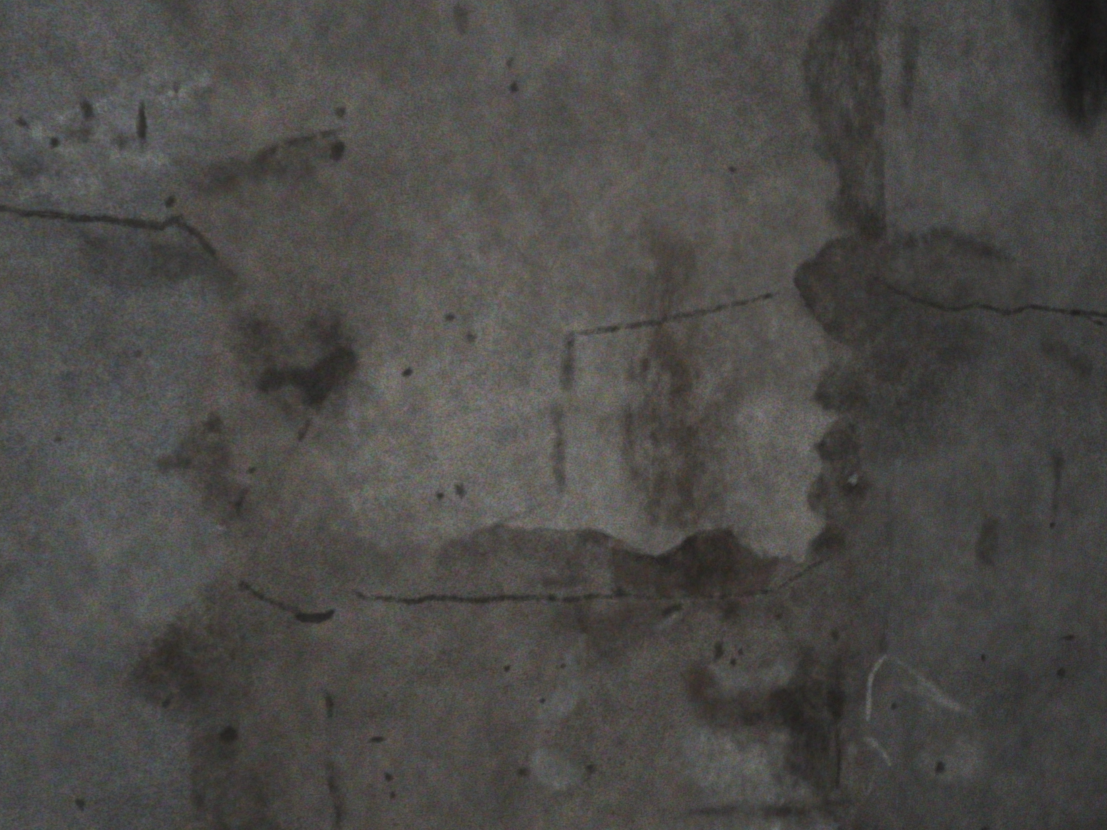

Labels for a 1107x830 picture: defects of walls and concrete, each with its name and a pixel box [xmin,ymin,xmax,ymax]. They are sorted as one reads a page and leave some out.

leakage [1054,0,1107,93]
crack [0,197,214,254]
crack [941,305,1105,324]
crack [242,583,334,622]
crack [360,595,519,603]